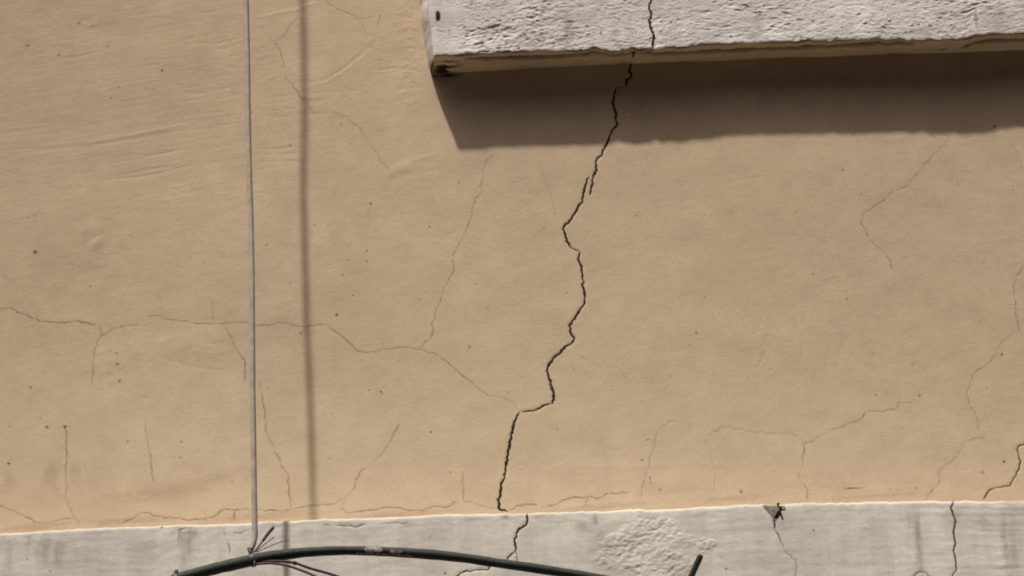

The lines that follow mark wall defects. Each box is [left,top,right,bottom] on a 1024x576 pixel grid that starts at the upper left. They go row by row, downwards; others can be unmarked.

crack [456,0,655,576]
crack [983,444,1024,499]
crack [914,502,957,576]